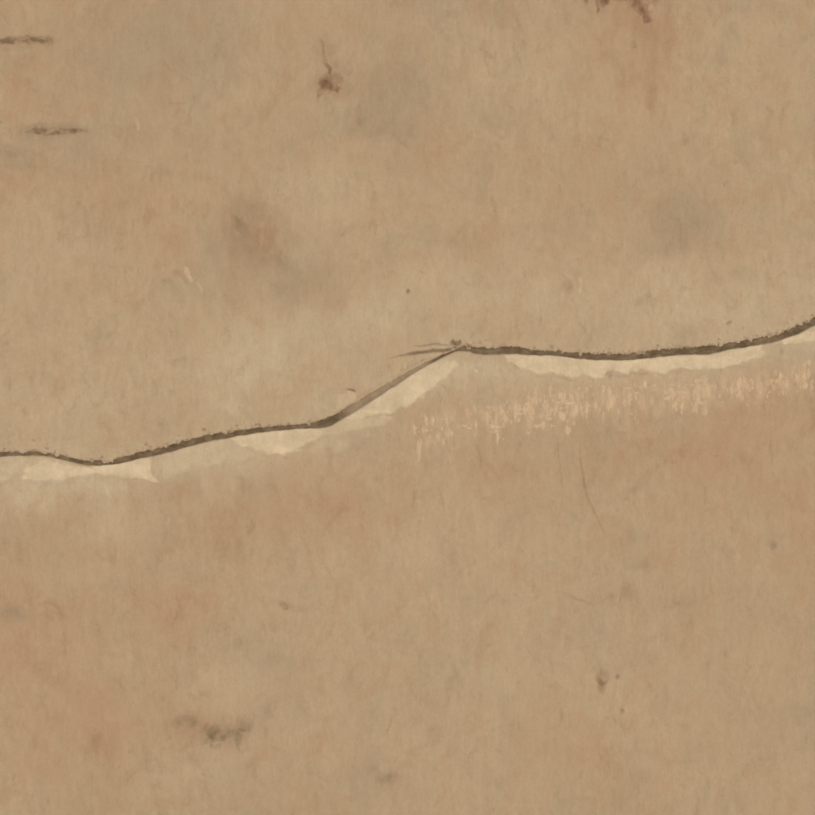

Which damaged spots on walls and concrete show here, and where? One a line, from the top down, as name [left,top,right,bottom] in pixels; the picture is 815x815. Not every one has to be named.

crack [0,313,815,467]